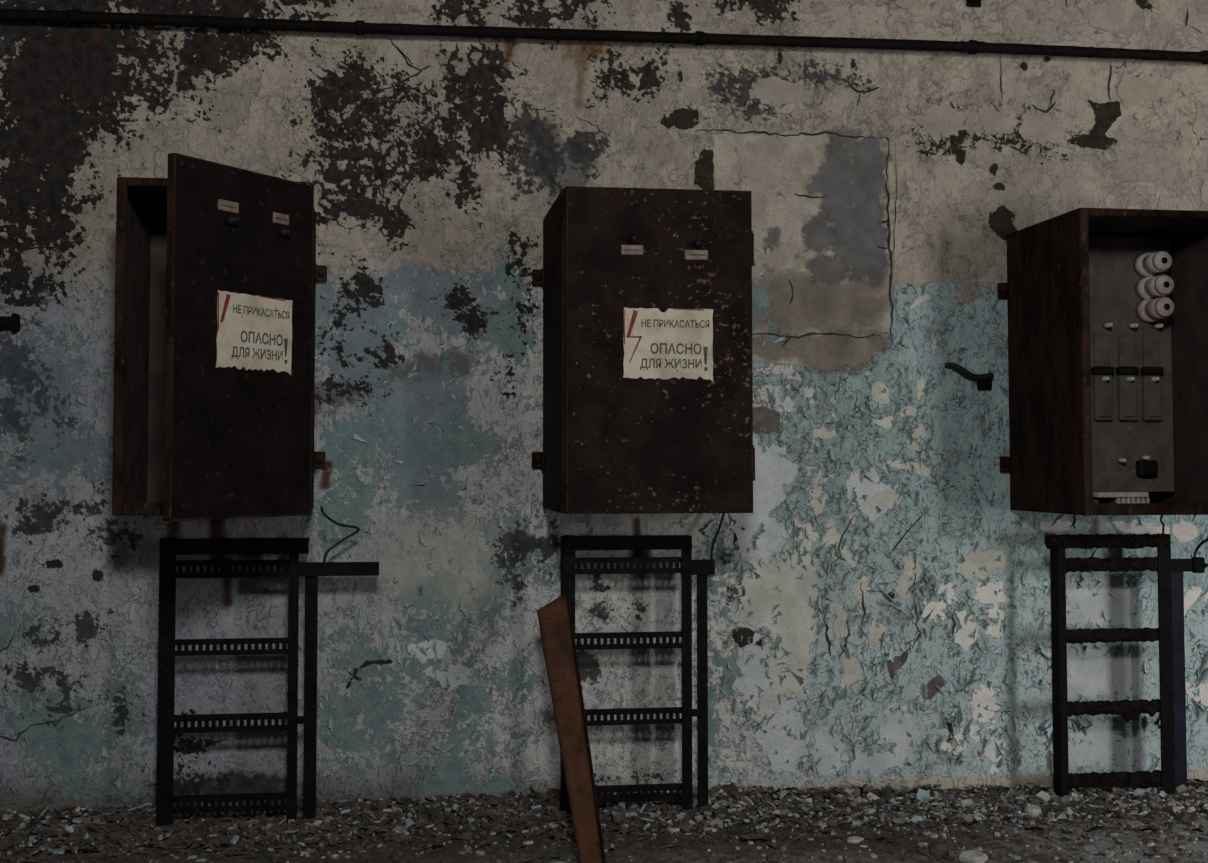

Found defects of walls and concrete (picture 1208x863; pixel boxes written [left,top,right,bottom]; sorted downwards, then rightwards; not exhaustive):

peeling [740,48,824,120]
spalling [659,108,701,137]
peeling [908,92,1122,165]
spalling [694,149,714,190]
spalling [986,163,1018,240]
peeling [733,130,803,362]
peeling [1040,513,1079,535]
peeling [1105,515,1198,557]
peeling [677,366,1053,788]
peeling [1066,549,1161,774]